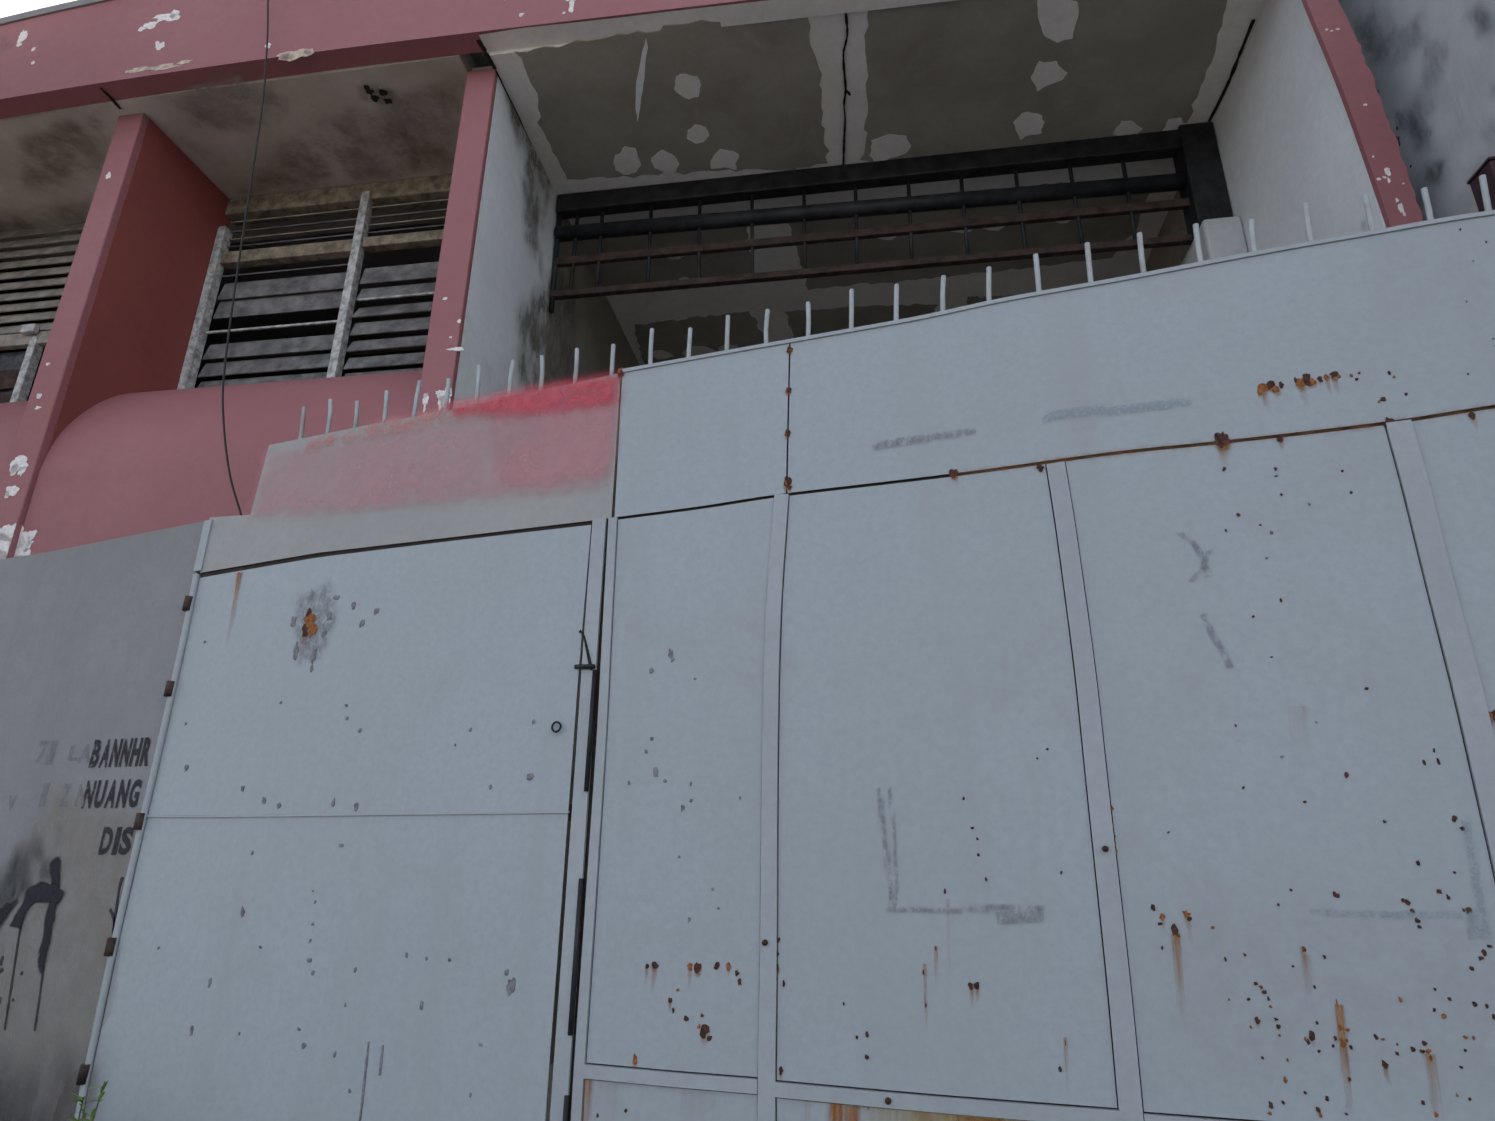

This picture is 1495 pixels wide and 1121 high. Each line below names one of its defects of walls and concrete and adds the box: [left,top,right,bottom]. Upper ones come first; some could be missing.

peeling [125,9,193,73]
peeling [265,43,314,62]
crack [842,13,851,165]
rust [1257,371,1360,395]
rust [1214,432,1230,449]
peeling [0,523,37,559]
rust [302,608,318,638]
rust [1151,904,1192,953]
rust [1228,982,1281,1037]
rust [1304,999,1353,1053]
rust [1374,1034,1432,1069]
rust [832,1103,870,1121]